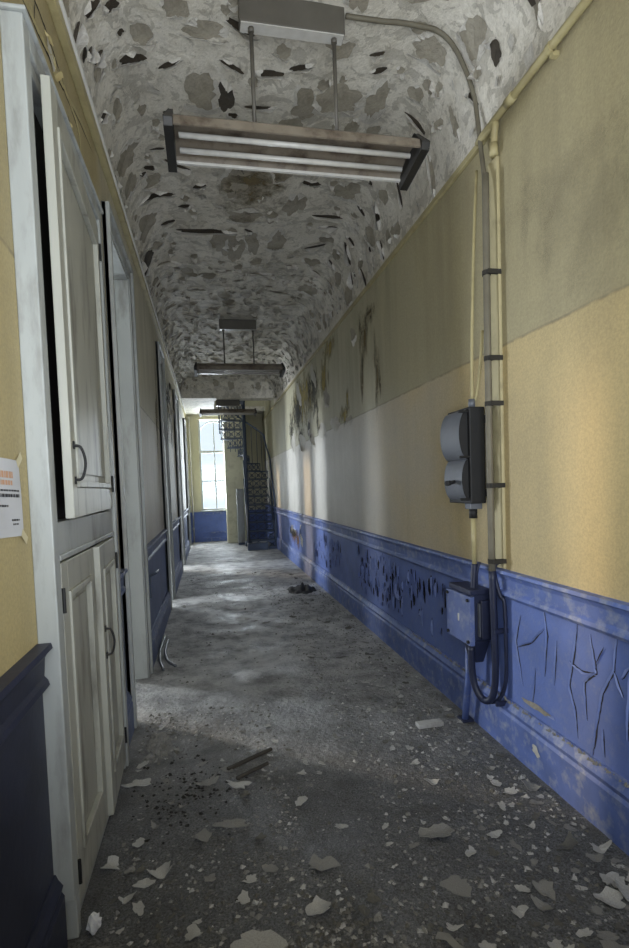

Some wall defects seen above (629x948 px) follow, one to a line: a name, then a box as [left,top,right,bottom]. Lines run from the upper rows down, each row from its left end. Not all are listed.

crack [23,0,93,151]
peeling [63,0,158,85]
peeling [100,43,315,132]
peeling [159,0,263,44]
peeling [343,0,369,13]
peeling [279,15,514,143]
peeling [108,136,436,436]
peeling [291,419,327,456]
crack [515,612,629,757]